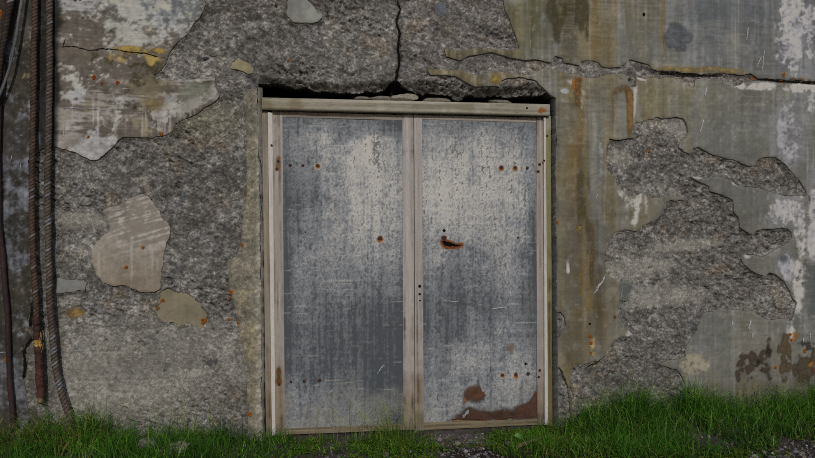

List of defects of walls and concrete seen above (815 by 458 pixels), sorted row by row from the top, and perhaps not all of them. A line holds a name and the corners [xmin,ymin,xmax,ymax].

crack [390,0,401,96]
rust [569,78,584,137]
damp [575,0,589,37]
rust [614,86,633,134]
spalling [462,53,815,87]
crack [661,70,722,78]
efflorescence [736,0,815,169]
crack [759,77,815,85]
spalling [51,0,519,438]
spalling [557,117,806,427]
damp [735,189,815,383]
rust [456,386,537,420]